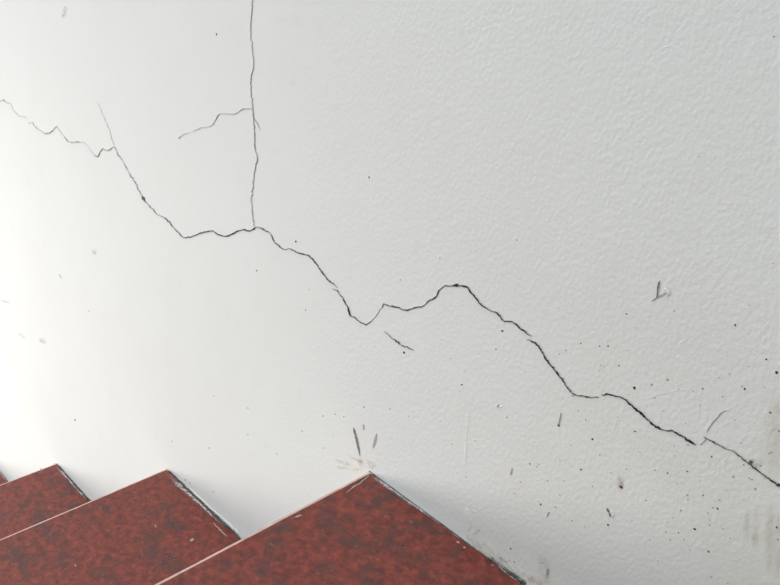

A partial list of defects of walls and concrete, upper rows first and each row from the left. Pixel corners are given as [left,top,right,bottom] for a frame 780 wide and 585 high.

crack [0,0,379,325]
crack [382,284,780,487]